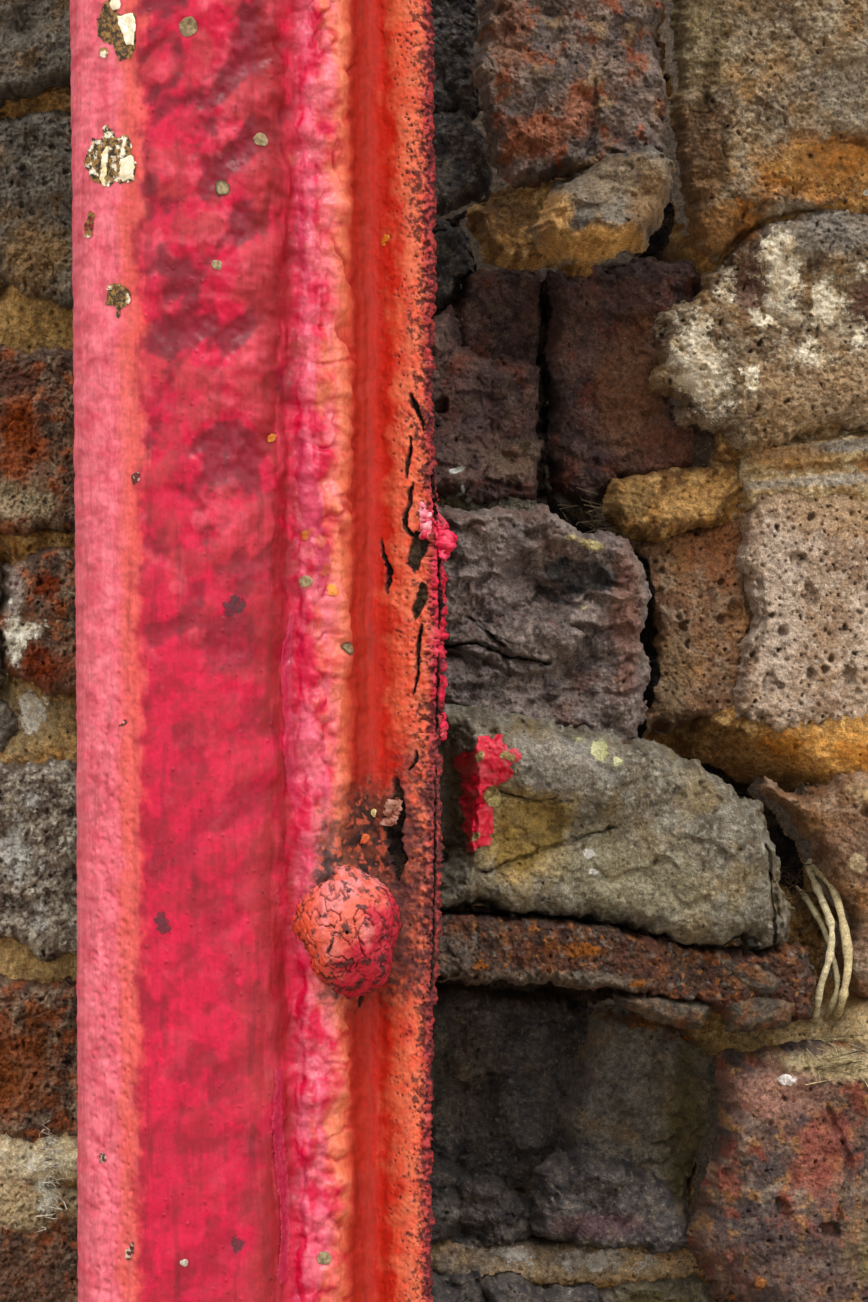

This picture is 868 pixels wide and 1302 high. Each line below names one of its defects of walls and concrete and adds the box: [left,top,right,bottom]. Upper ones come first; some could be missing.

peeling [96,0,136,61]
peeling [84,124,137,187]
crack [535,280,598,533]
crack [382,394,697,991]
crack [682,757,804,947]